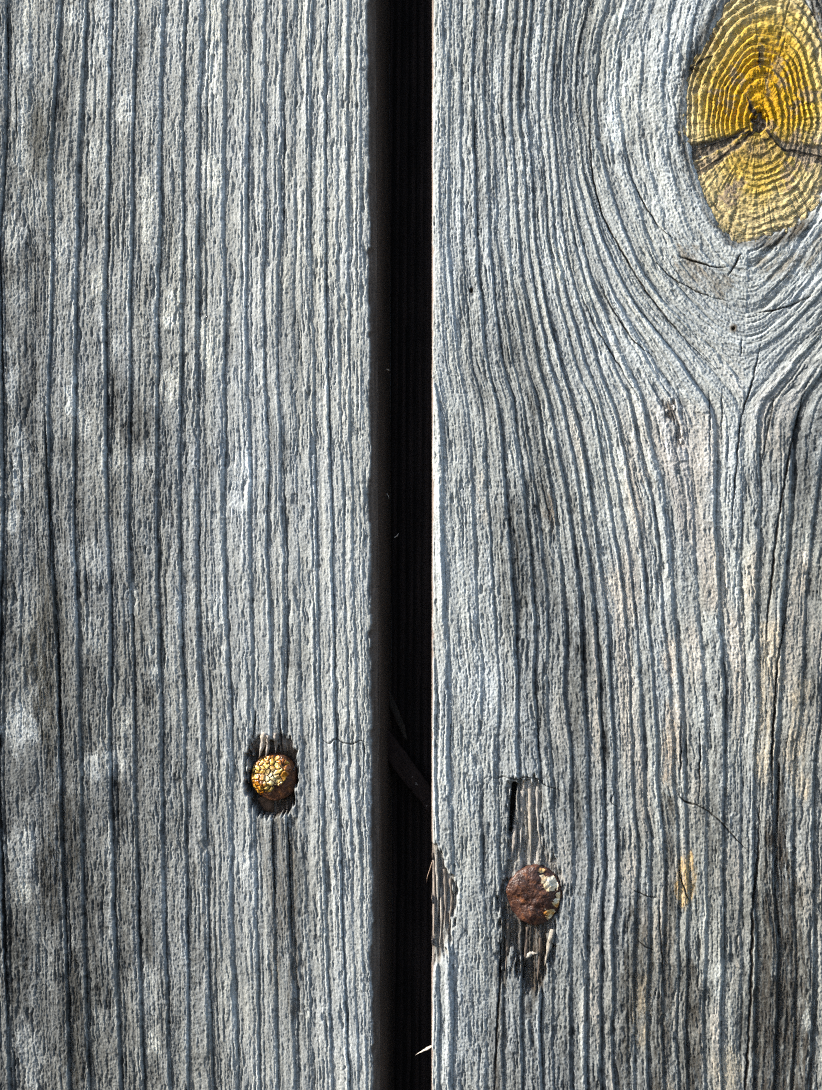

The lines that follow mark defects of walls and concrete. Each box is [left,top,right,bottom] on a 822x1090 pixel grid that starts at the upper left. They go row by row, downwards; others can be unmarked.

crack [689,56,712,71]
crack [579,92,822,1090]